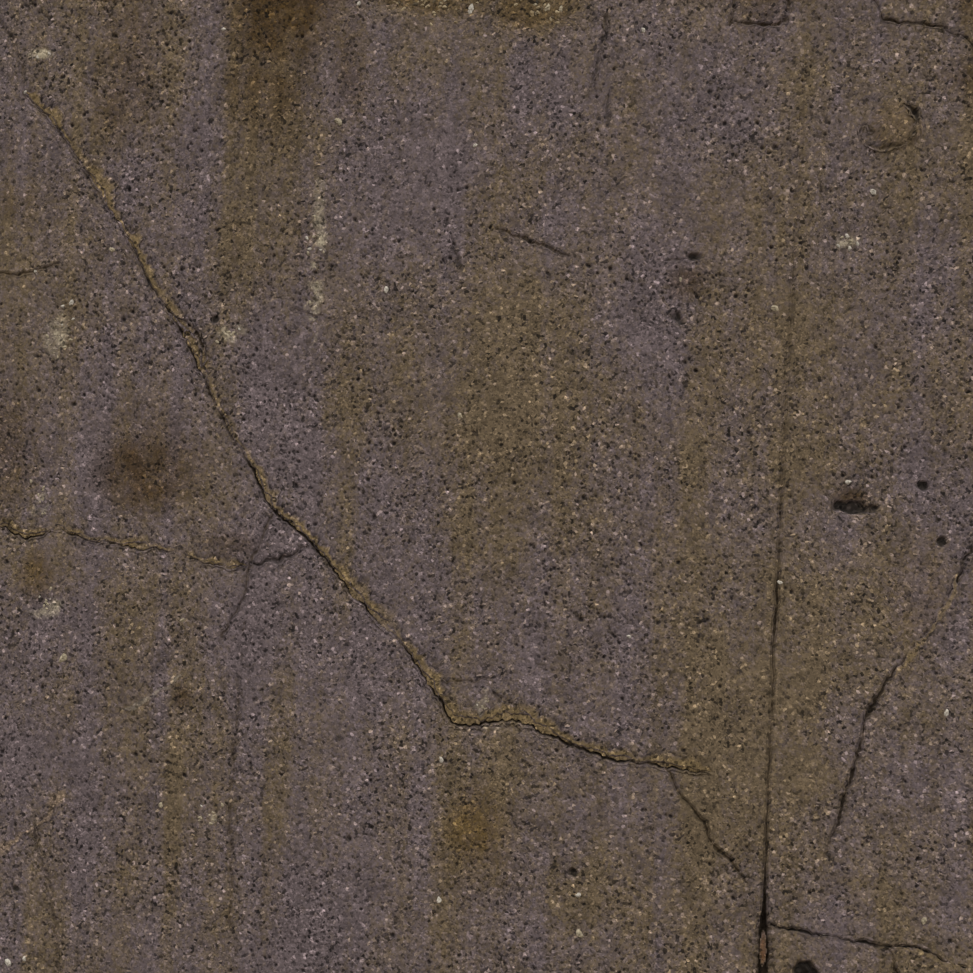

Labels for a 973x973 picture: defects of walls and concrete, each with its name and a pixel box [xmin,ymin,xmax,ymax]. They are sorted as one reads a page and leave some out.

leakage [25,48,56,60]
crack [728,0,793,28]
crack [874,0,973,48]
leakage [0,88,80,249]
leakage [209,0,381,323]
leakage [213,323,254,344]
leakage [290,169,329,353]
leakage [77,379,220,532]
crack [0,6,745,973]
crack [752,99,973,973]